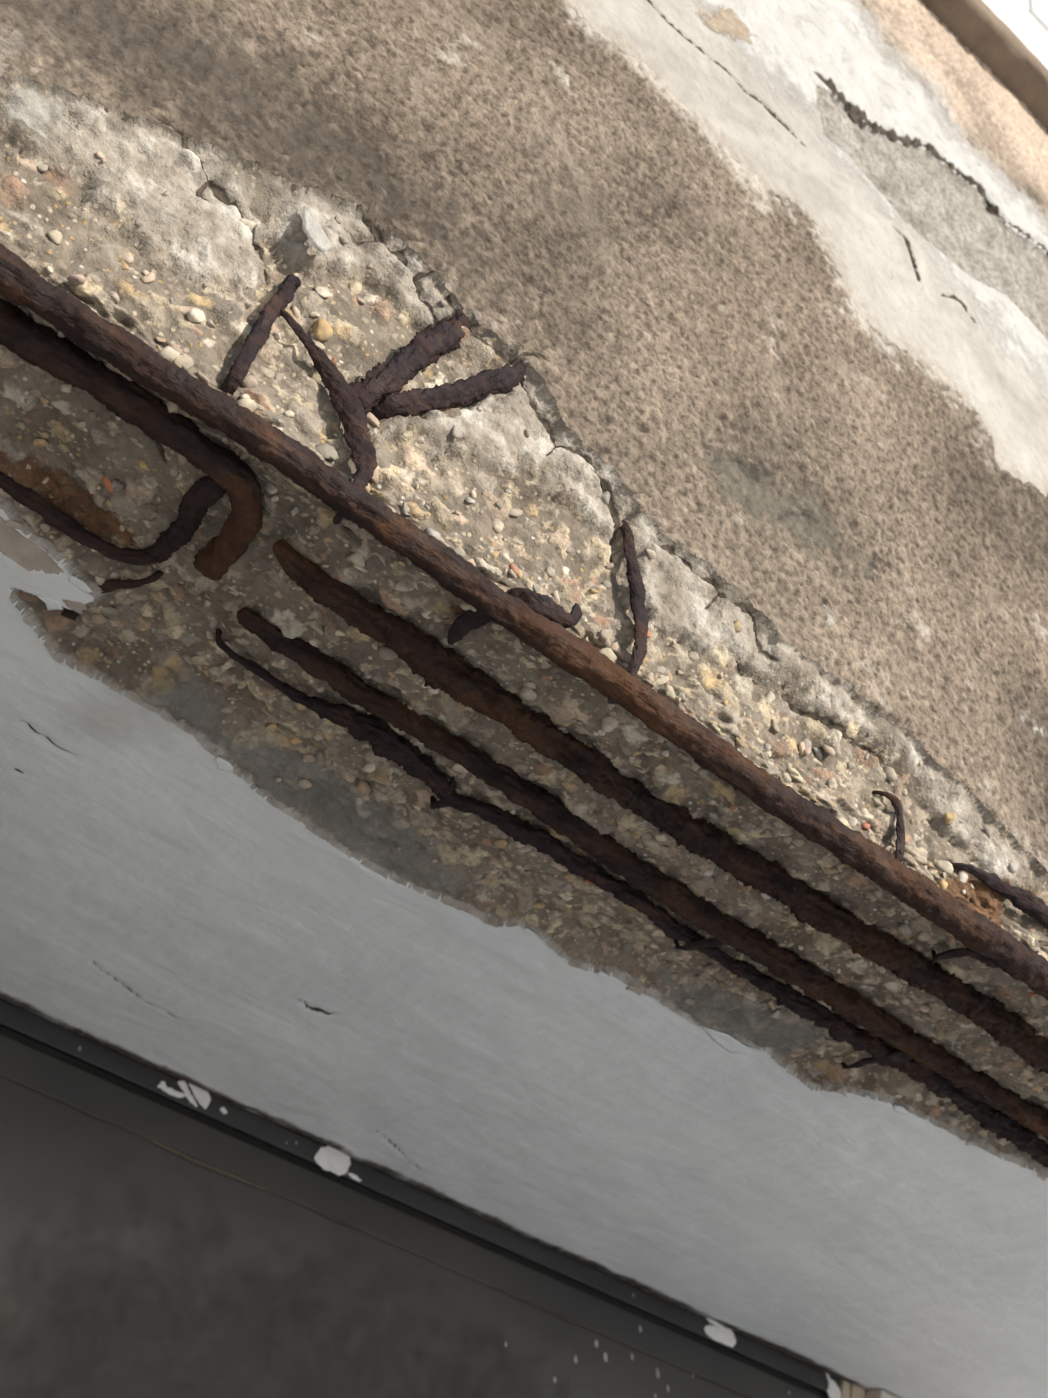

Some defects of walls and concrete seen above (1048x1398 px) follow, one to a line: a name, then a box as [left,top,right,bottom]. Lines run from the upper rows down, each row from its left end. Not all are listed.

crack [647,0,805,146]
spalling [0,73,1048,1181]
corrosion [0,244,1048,1074]
corrosion [215,607,1048,1168]